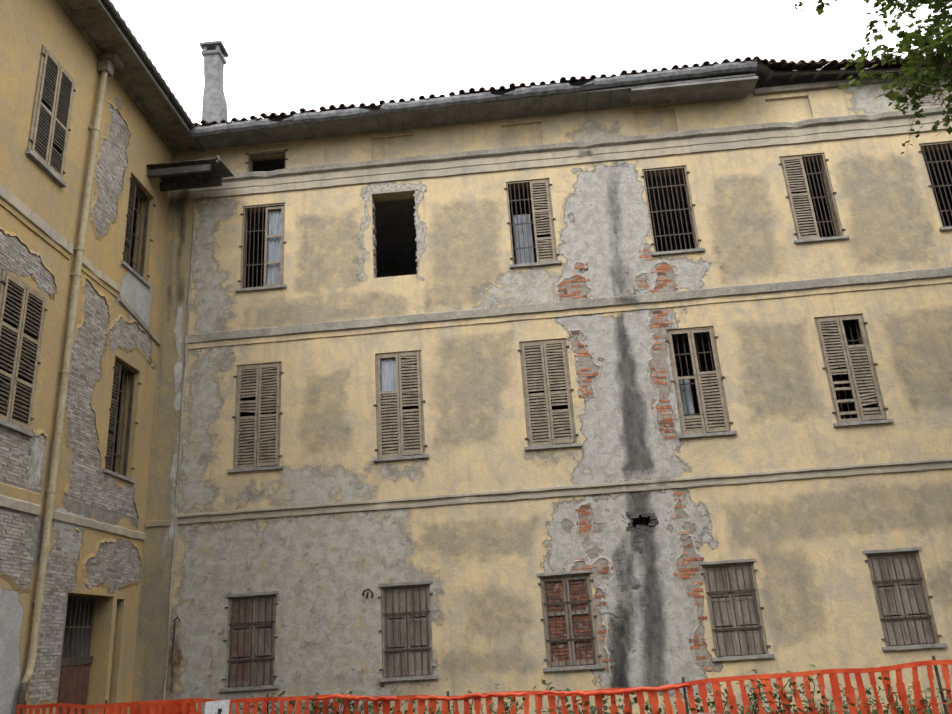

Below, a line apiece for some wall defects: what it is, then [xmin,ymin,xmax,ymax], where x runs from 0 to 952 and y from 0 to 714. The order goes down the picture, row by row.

flaking render [0,226,58,301]
flaking render [89,97,131,241]
peeling [192,198,238,333]
spalling [352,181,427,281]
peeling [471,160,711,309]
water stain [617,317,653,477]
flaking render [0,276,156,713]
peeling [169,345,443,714]
peeling [524,307,723,700]
water stain [629,491,648,515]
water stain [609,527,664,688]